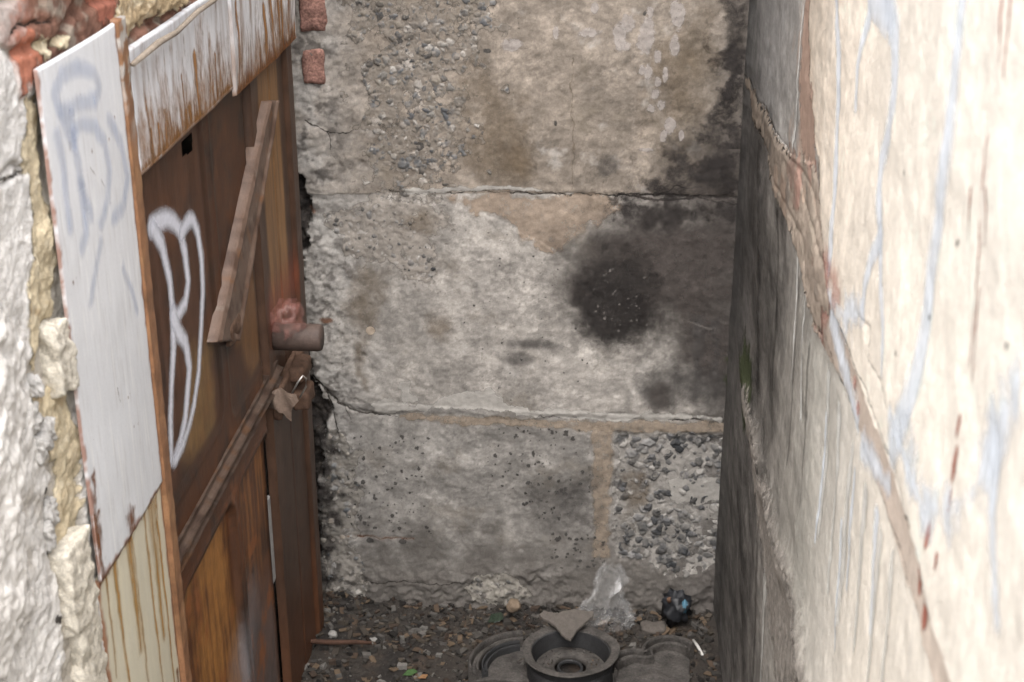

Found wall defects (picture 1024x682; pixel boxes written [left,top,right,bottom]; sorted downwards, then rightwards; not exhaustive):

corrosion [138,0,296,170]
spalling [298,0,621,283]
crack [375,185,737,205]
peeling [613,0,685,152]
leakage [571,0,746,408]
crack [634,416,719,424]
corrosion [91,470,179,682]